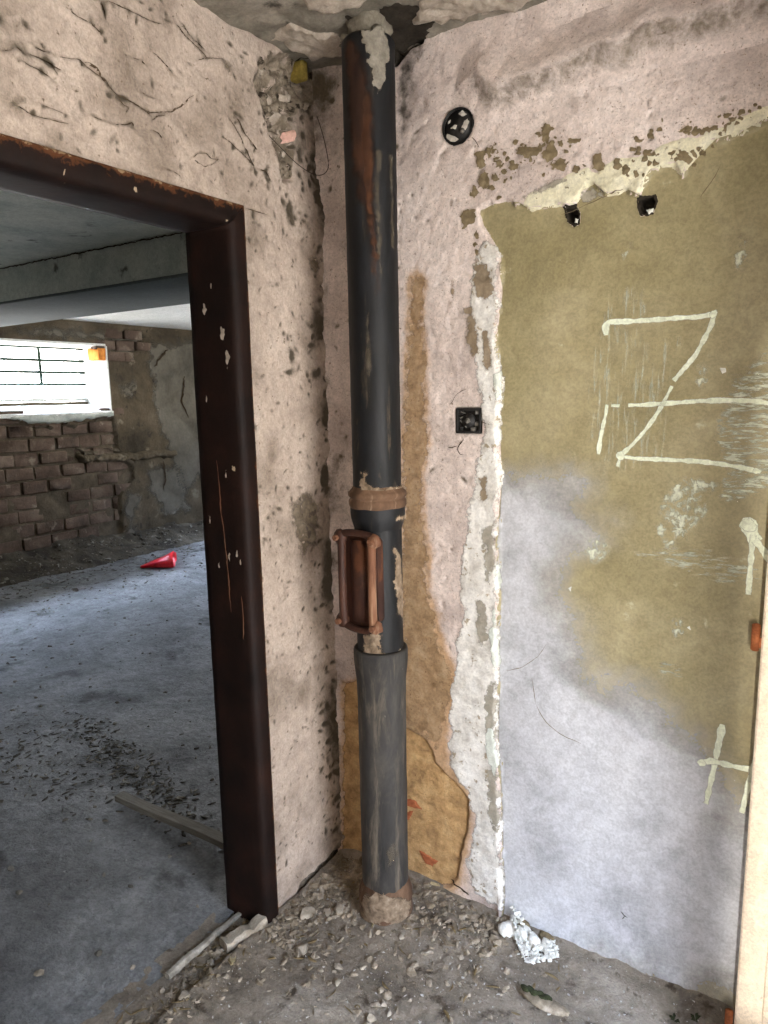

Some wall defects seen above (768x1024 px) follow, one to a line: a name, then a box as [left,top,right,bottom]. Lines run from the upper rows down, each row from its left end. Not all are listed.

crack [66,1,221,60]
peeling [304,0,366,20]
peeling [379,0,531,67]
crack [5,47,194,138]
flaking render [253,23,342,181]
crack [168,119,281,180]
corrosion [345,41,378,260]
peeling [359,103,768,965]
flaking render [299,680,362,890]
peeling [686,969,737,1008]